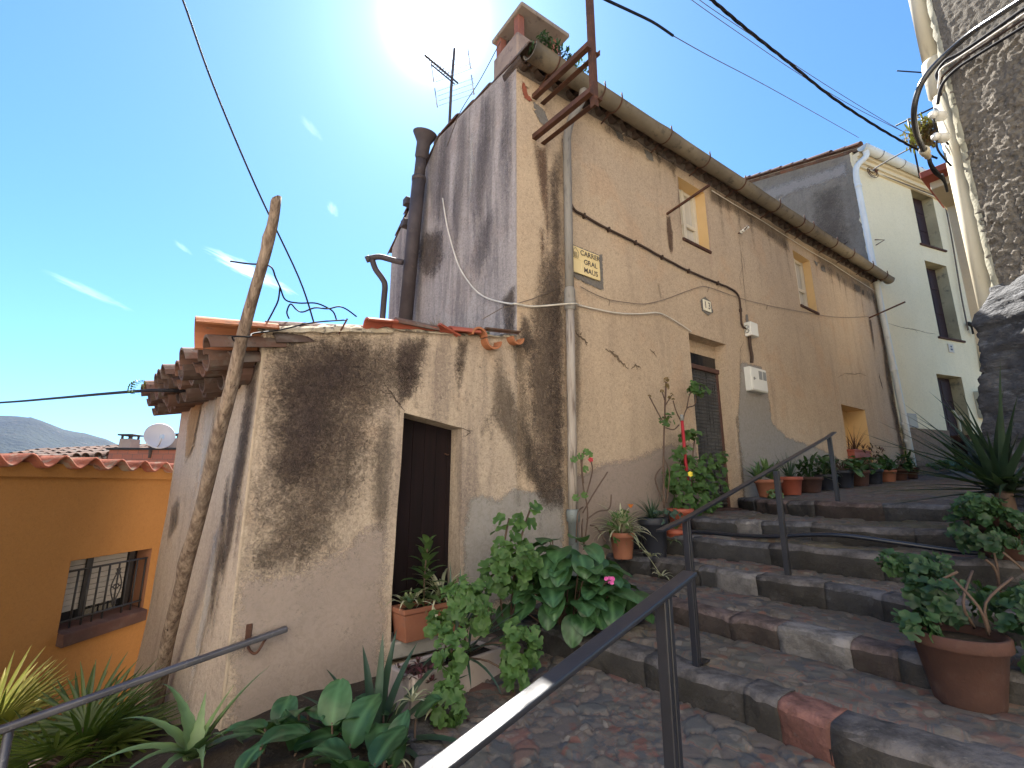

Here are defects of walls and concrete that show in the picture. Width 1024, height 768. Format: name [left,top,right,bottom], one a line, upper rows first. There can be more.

water stain [419,231,442,276]
water stain [494,157,565,504]
water stain [196,337,427,657]